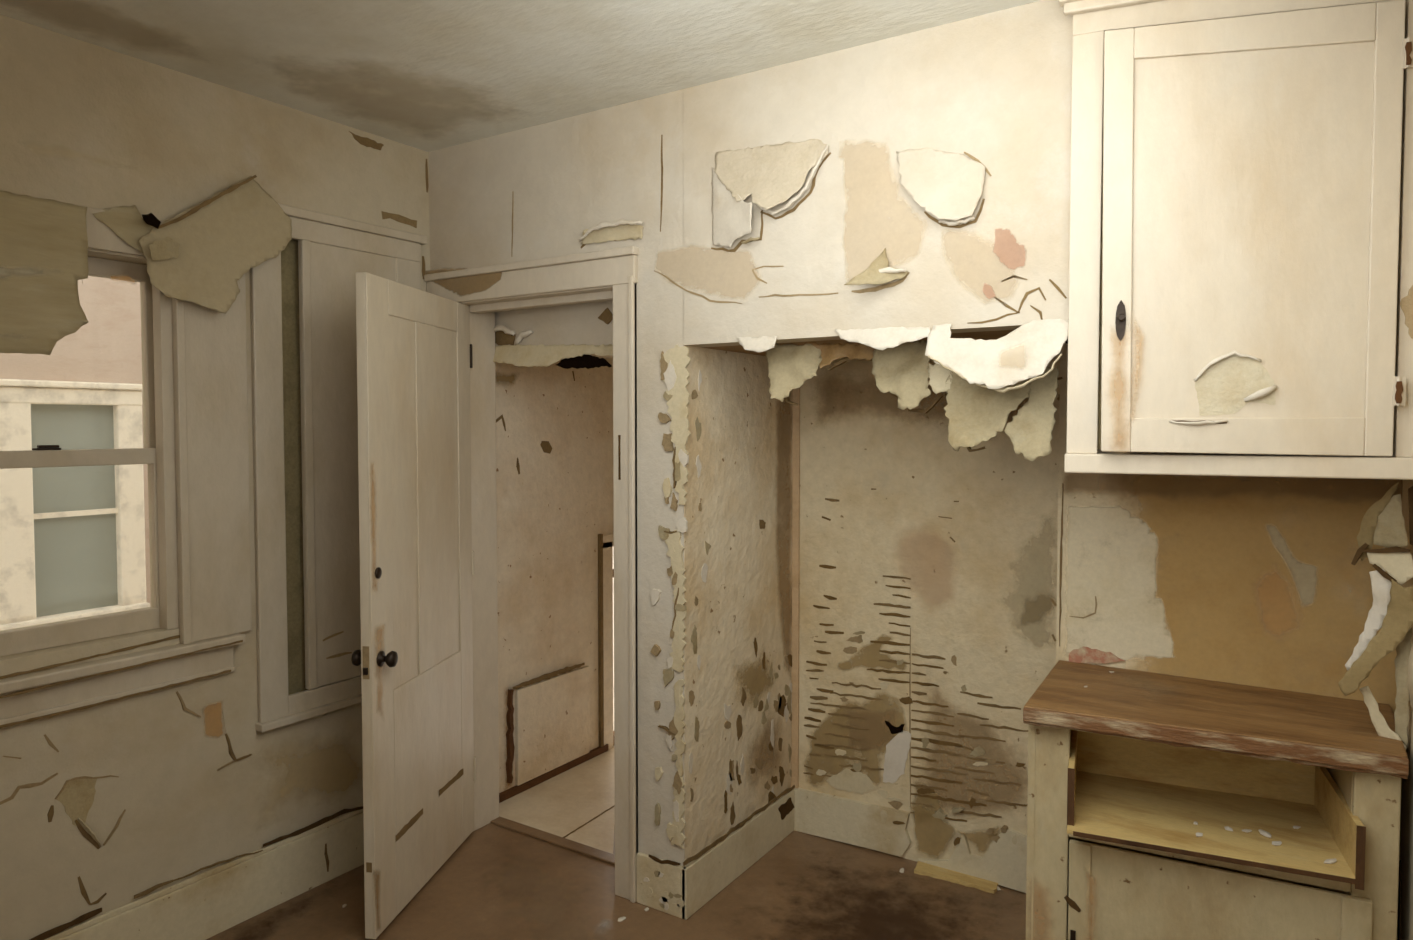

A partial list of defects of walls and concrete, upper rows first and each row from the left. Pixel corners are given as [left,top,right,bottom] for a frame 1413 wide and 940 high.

peeling [896,148,1025,299]
flaking render [650,345,711,849]
flaking render [1005,507,1173,673]
crack [0,773,58,805]
crack [78,876,107,905]
flaking render [643,870,685,911]
peeling [724,638,795,825]
damp [912,784,999,856]